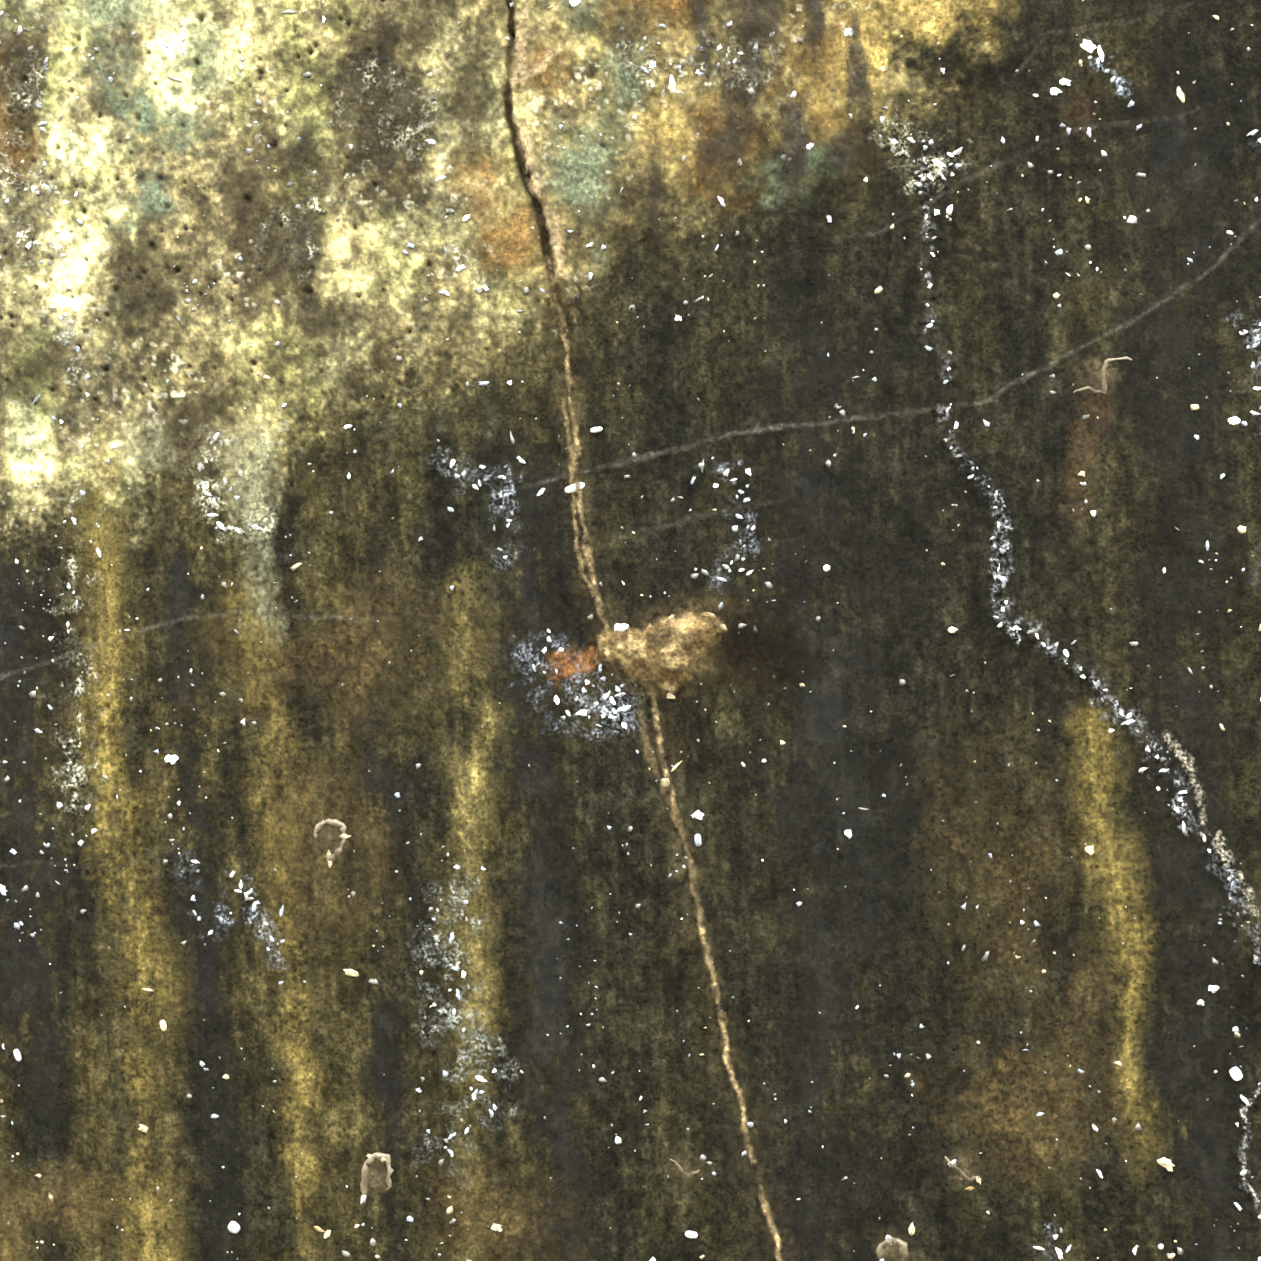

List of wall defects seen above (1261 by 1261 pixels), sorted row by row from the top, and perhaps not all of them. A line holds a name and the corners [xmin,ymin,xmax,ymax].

damp [0,11,82,205]
damp [327,0,458,206]
damp [625,61,683,99]
damp [689,0,780,116]
damp [0,304,91,404]
damp [66,227,168,338]
damp [227,127,359,334]
damp [429,166,470,221]
damp [427,244,477,296]
crack [504,0,612,636]
corrosion [555,652,589,677]
crack [640,679,781,1261]